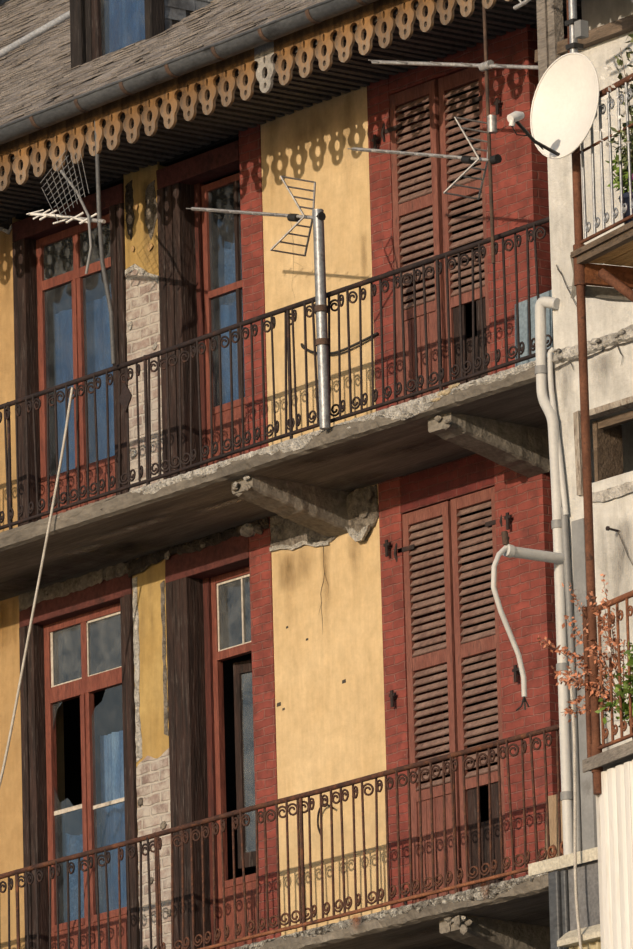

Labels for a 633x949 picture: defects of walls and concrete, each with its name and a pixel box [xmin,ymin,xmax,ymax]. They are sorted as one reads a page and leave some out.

flaking render [125,180,157,252]
flaking render [125,264,323,497]
spalling [334,360,536,430]
spalling [0,495,116,540]
flaking render [18,485,379,949]
spalling [231,873,547,949]